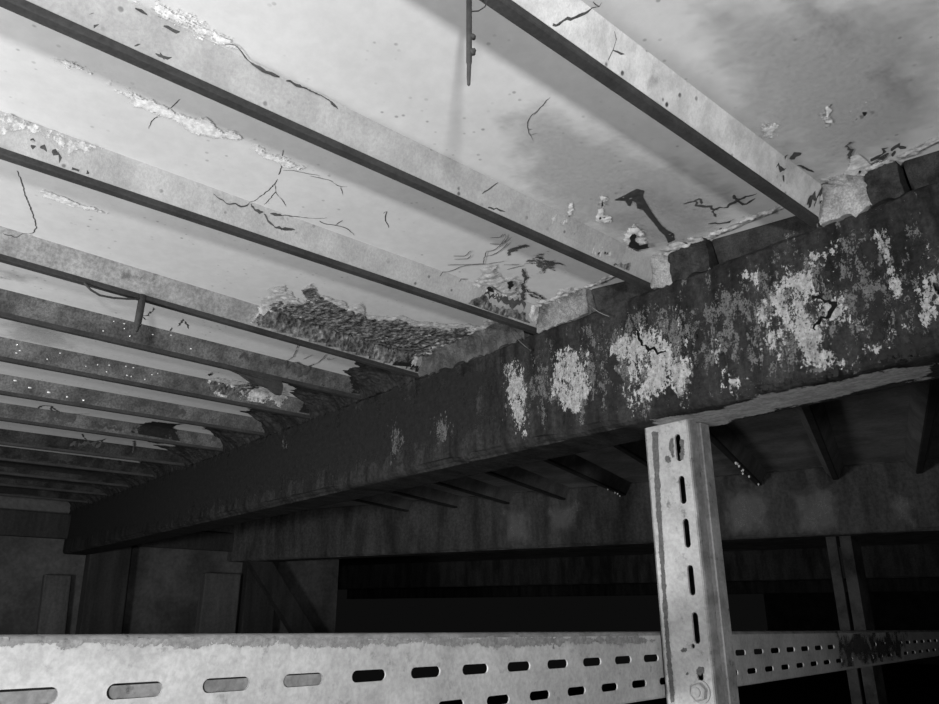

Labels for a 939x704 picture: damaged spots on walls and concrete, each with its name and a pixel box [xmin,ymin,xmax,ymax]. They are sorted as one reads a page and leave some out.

crack [230,44,338,109]
crack [4,171,37,238]
crack [214,153,354,235]
crack [440,183,545,309]
spalling [595,189,685,255]
crack [683,194,756,229]
peeling [844,153,889,176]
spalling [250,283,479,363]
crack [812,295,837,330]
spalling [207,372,290,408]
damp [0,212,939,551]